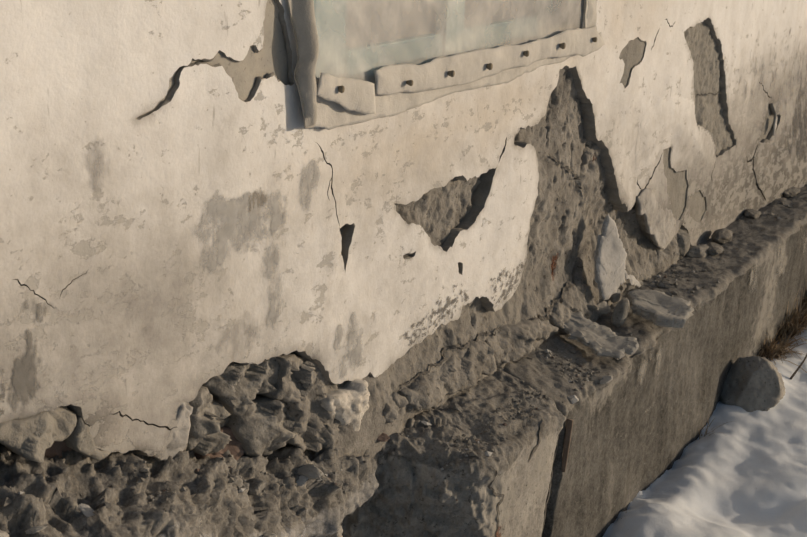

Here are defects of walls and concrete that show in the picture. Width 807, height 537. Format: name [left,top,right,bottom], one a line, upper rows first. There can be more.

flaking render [136,0,294,120]
flaking render [619,37,647,88]
flaking render [684,18,736,158]
leakage [790,72,807,161]
crack [317,143,340,229]
crack [747,145,766,200]
crack [13,272,87,307]
flaking render [133,66,707,461]
flaking render [0,404,120,463]
crack [112,411,175,430]
crack [488,466,504,537]